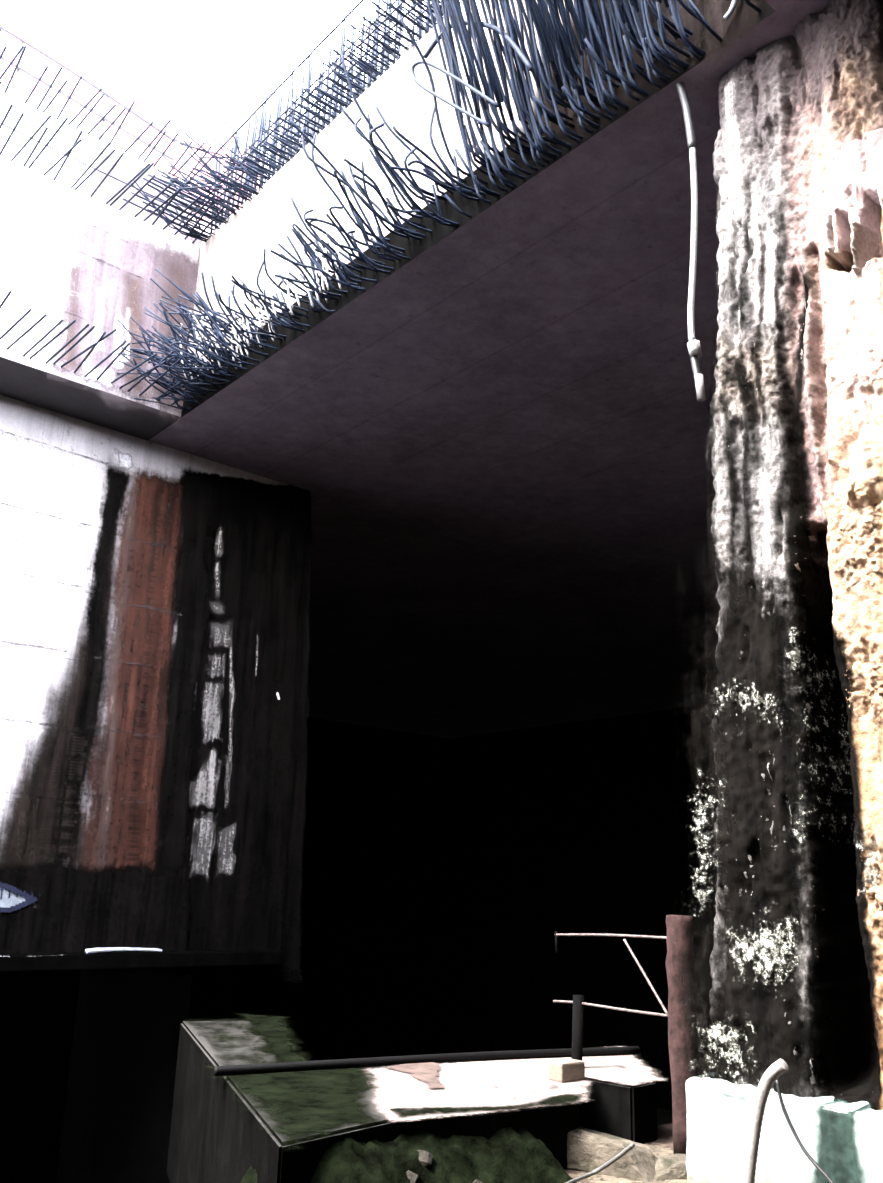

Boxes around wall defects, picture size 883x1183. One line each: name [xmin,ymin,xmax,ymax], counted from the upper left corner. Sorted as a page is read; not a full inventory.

spalling [0,0,706,410]
peeling [824,128,883,275]
spalling [826,334,883,391]
rust [80,471,183,871]
damp [0,449,313,983]
damp [679,80,882,1183]